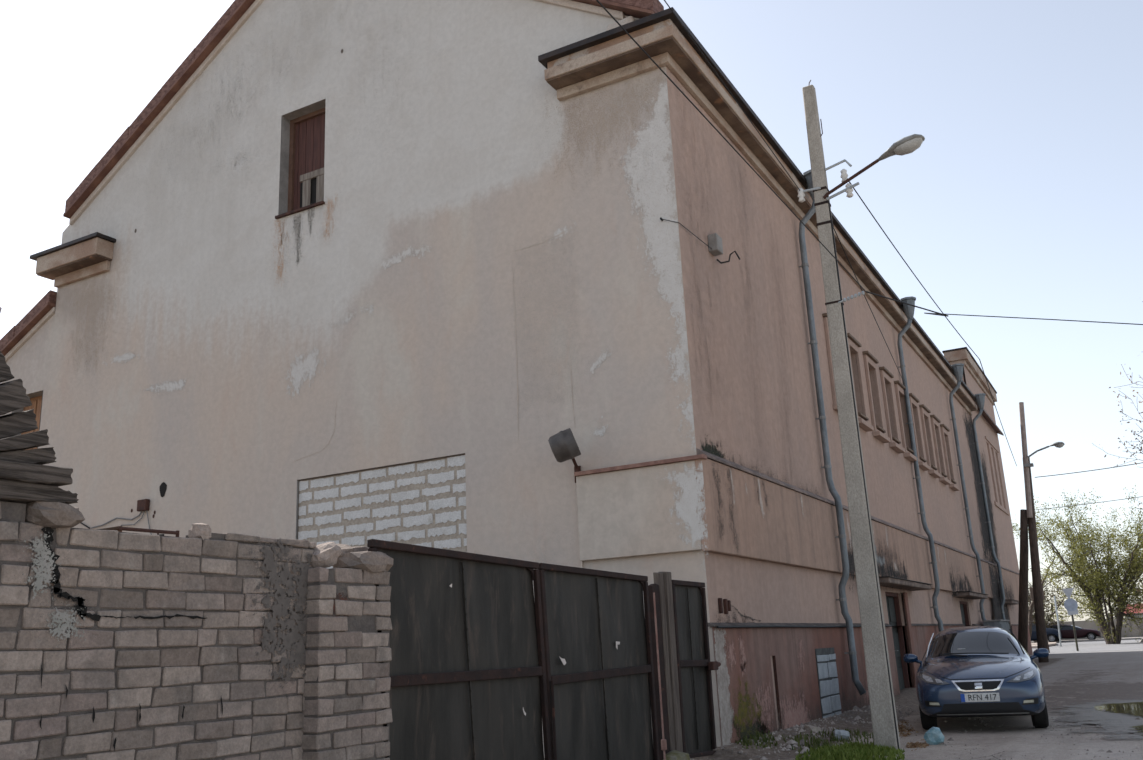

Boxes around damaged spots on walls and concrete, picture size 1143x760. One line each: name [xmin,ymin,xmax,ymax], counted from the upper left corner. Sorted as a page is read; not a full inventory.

water stain [285,204,323,266]
peeling [618,82,709,569]
crack [41,527,206,621]